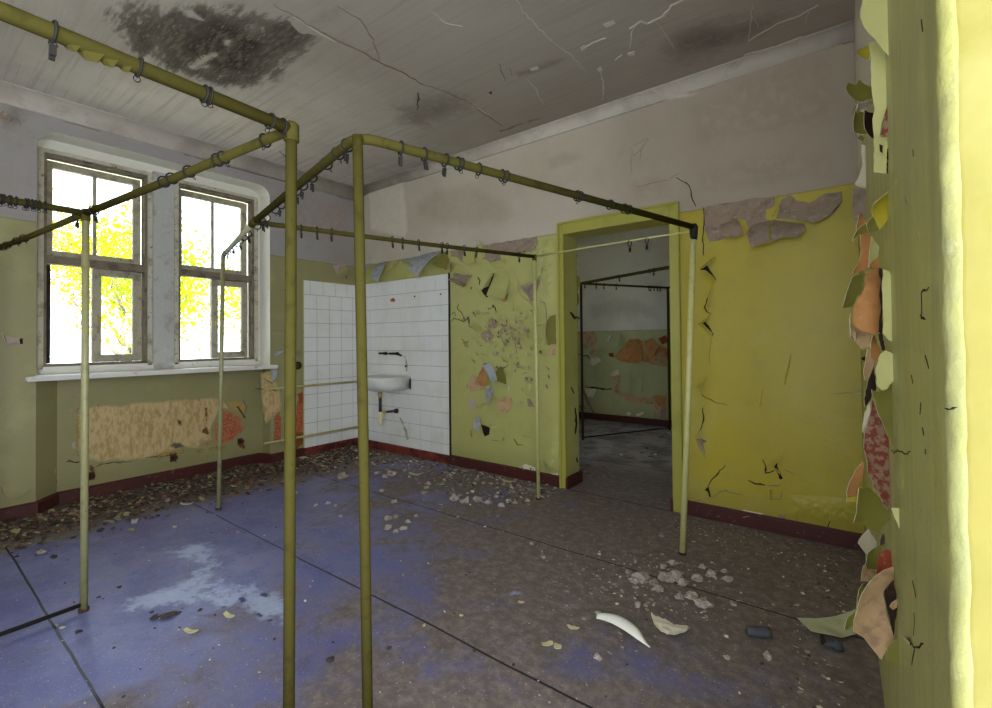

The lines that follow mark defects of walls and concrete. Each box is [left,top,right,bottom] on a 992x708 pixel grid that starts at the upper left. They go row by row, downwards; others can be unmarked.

damp [87,0,329,93]
crack [273,4,544,126]
crack [516,0,684,100]
flaking render [70,396,242,464]
flaking render [260,350,302,424]
peeling [365,236,556,445]
peeling [607,334,668,367]
flaking render [698,0,899,666]
crack [694,459,795,502]